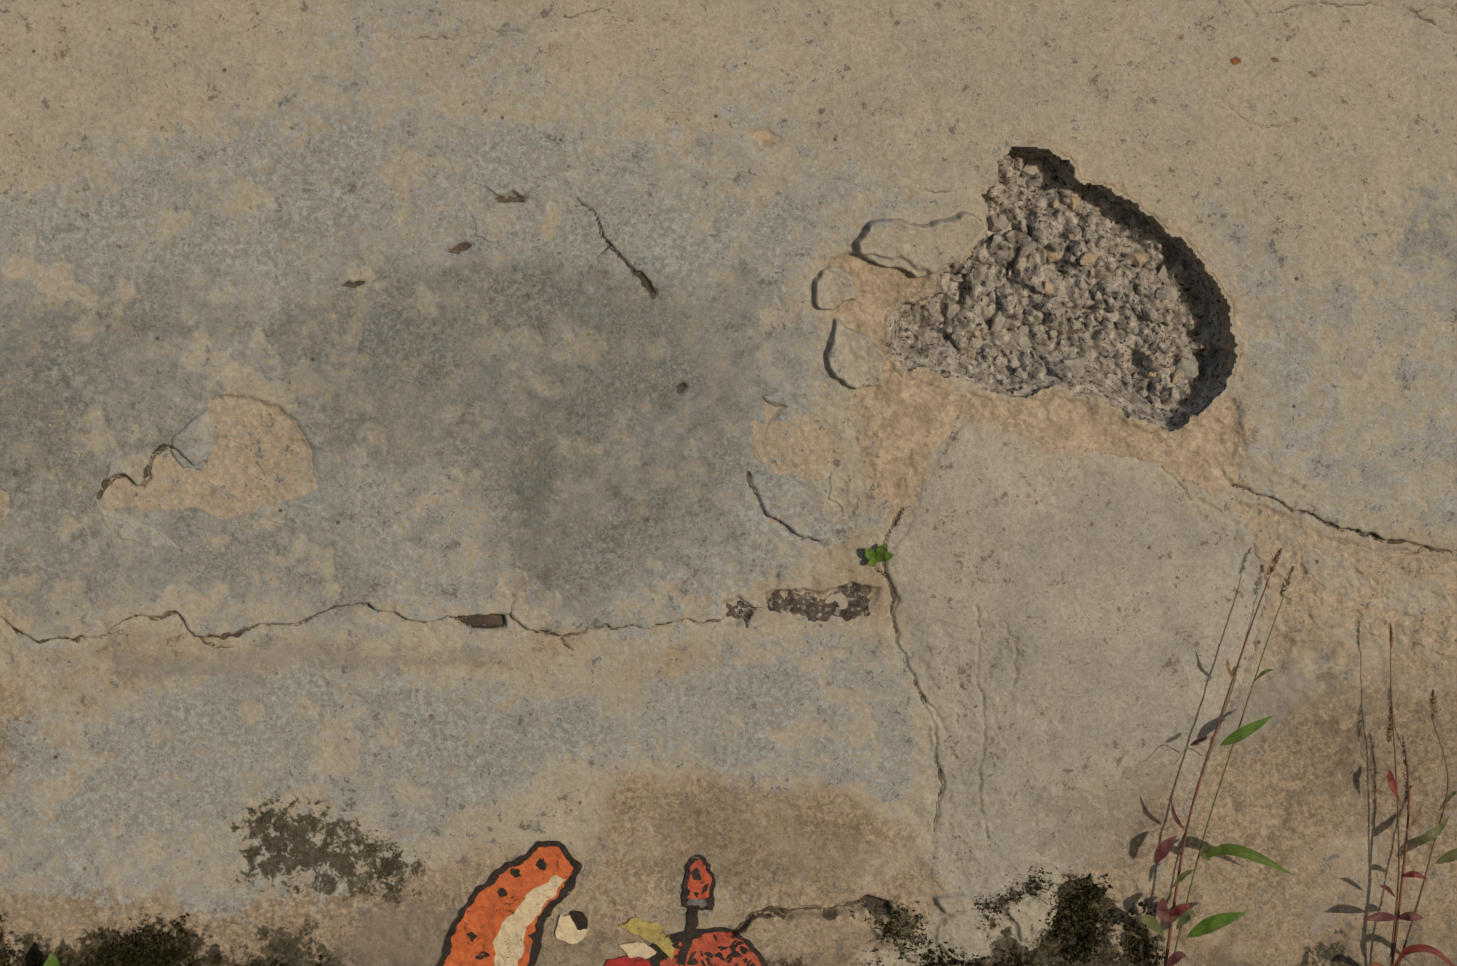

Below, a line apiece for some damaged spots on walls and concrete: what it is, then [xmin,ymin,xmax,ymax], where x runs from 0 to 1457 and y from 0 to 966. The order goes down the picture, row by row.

crack [583,204,659,300]
spalling [813,138,1248,517]
spalling [101,395,329,549]
crack [1160,466,1457,559]
crack [12,595,768,649]
spalling [726,583,872,628]
spalling [1236,502,1457,659]
damp [231,795,430,906]
damp [0,912,370,966]
crack [732,895,892,933]
damp [873,898,923,963]
damp [971,874,1165,966]